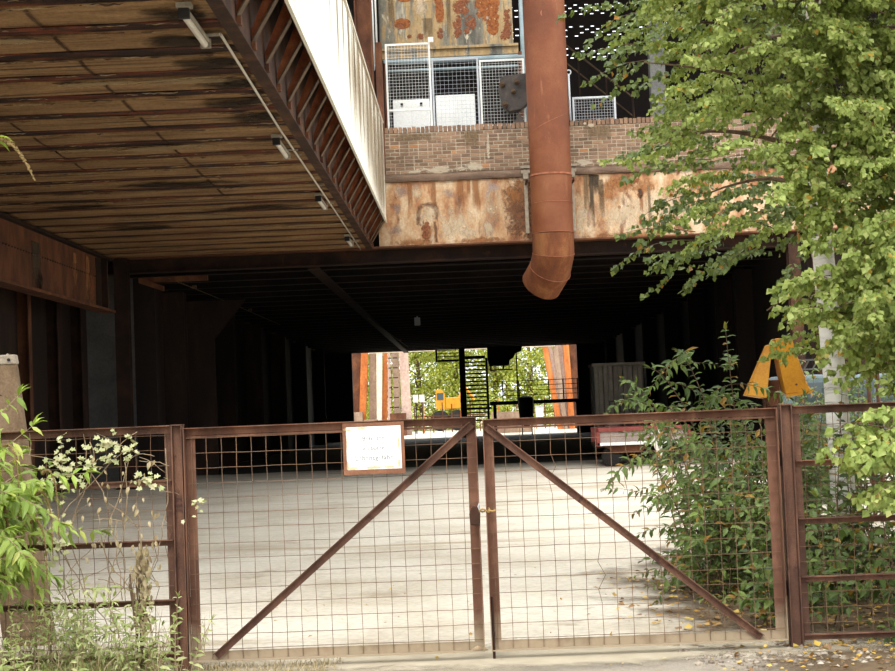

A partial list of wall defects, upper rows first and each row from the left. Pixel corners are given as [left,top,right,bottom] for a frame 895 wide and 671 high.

leakage [146,7,205,22]
corrosion [394,18,424,40]
corrosion [434,0,512,40]
leakage [0,10,255,195]
leakage [206,98,278,123]
corrosion [458,180,480,206]
leakage [109,205,307,230]
corrosion [462,179,532,243]